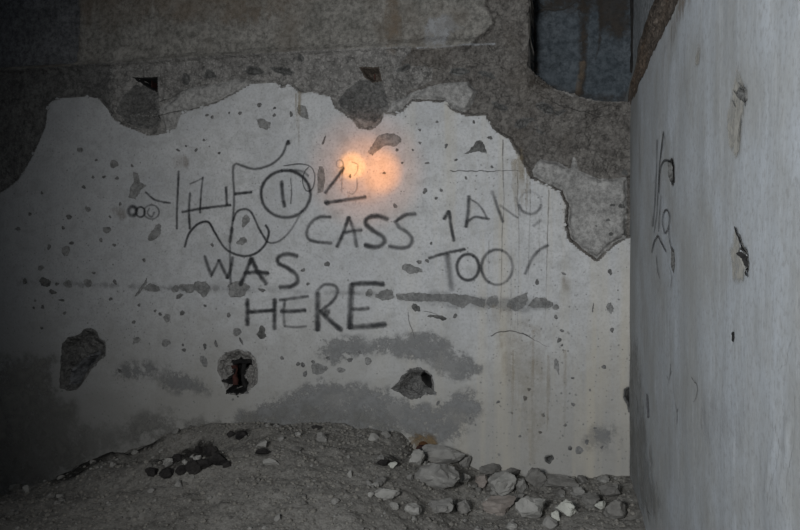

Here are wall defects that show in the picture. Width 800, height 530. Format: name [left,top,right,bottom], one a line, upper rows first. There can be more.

spalling [0,0,678,262]
flaking render [727,76,748,156]
flaking render [731,226,749,283]
spalling [59,328,106,391]
spalling [200,328,258,397]
water stain [237,382,481,443]
water stain [321,332,482,380]
spalling [391,367,440,406]